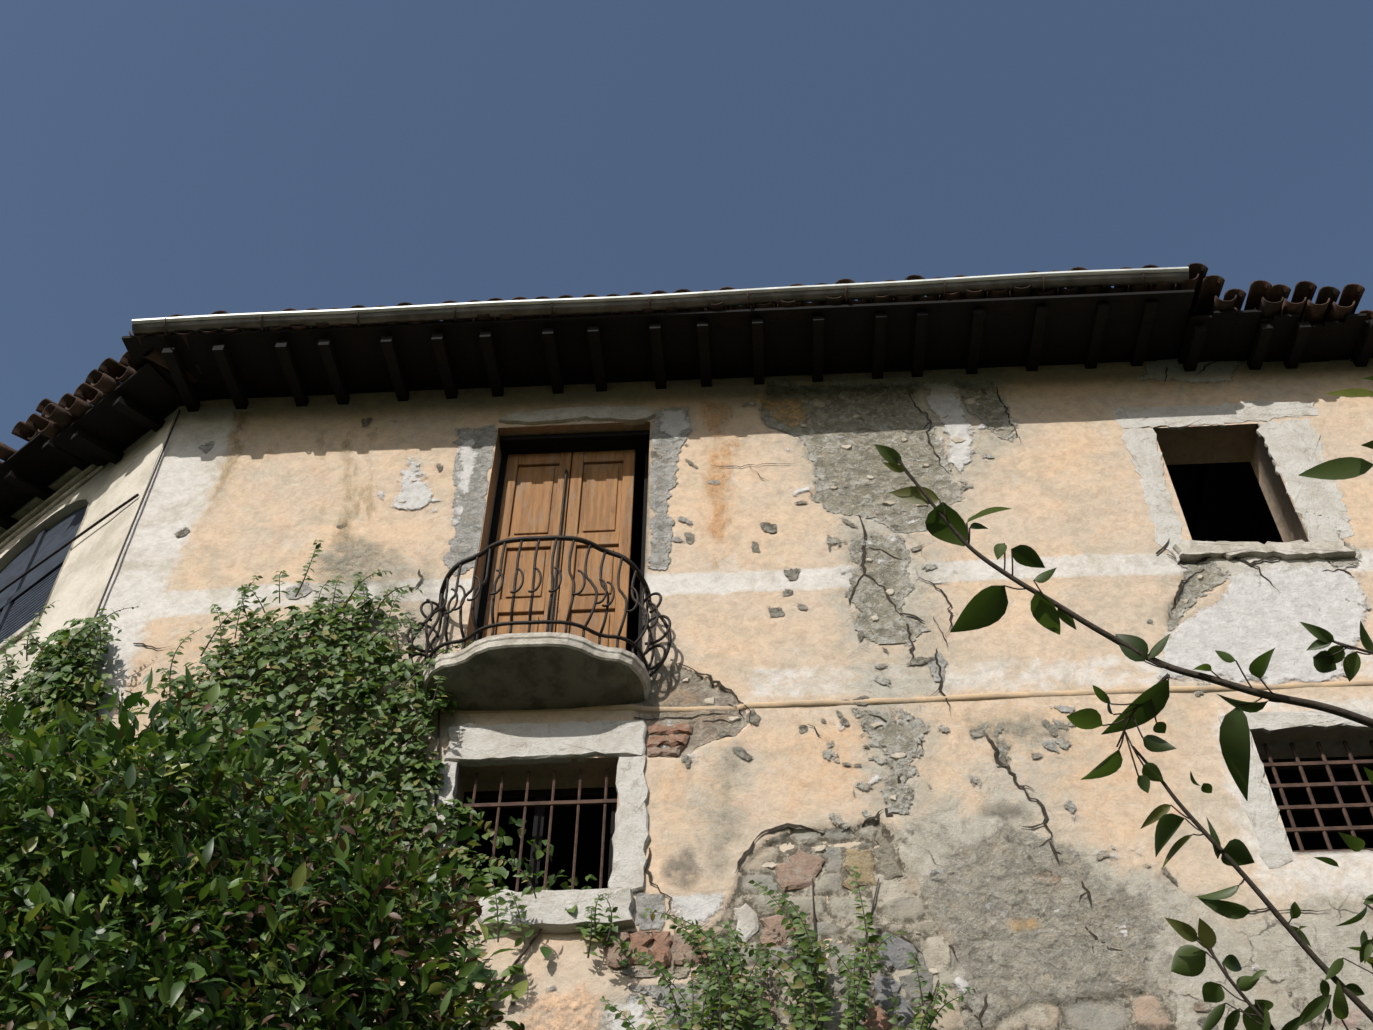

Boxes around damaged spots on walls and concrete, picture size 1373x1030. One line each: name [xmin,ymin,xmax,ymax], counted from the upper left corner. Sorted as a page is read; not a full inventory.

flaking render [955,379,1019,442]
spalling [671,516,694,544]
flaking render [740,380,994,686]
crack [849,515,953,715]
spalling [1143,557,1230,631]
spalling [635,665,761,768]
crack [869,714,923,753]
crack [735,809,883,873]
flaking render [603,695,1218,1030]
crack [983,730,1123,963]
flaking render [1275,989,1373,1030]